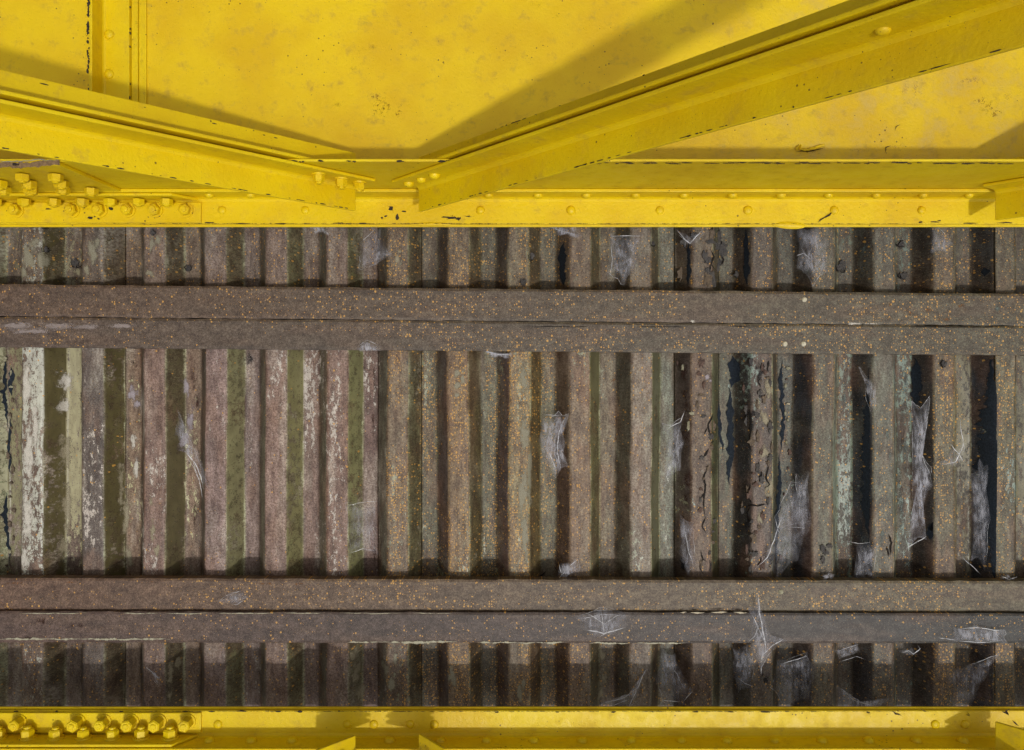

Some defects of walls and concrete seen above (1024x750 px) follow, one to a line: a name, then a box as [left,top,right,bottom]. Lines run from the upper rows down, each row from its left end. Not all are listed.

peeling [6,354,39,568]
peeling [676,358,716,441]
peeling [740,358,791,570]